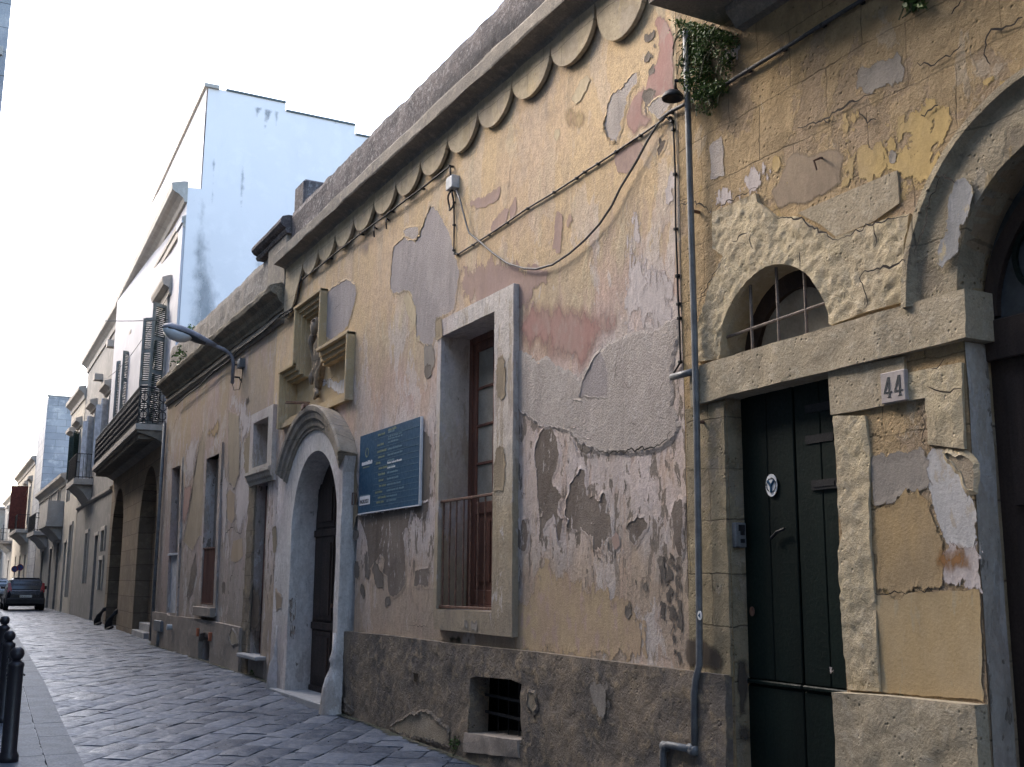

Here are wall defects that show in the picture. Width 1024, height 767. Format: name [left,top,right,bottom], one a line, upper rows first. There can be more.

crack [917,17,1022,67]
spalling [603,16,674,174]
crack [798,68,876,128]
peeling [470,186,517,232]
flaking render [710,155,782,213]
damp [197,273,211,324]
flaking render [326,278,357,341]
flaking render [390,204,460,379]
flaking render [572,348,608,412]
spalling [942,448,980,496]
flaking render [622,580,648,619]
flaking render [657,553,683,665]